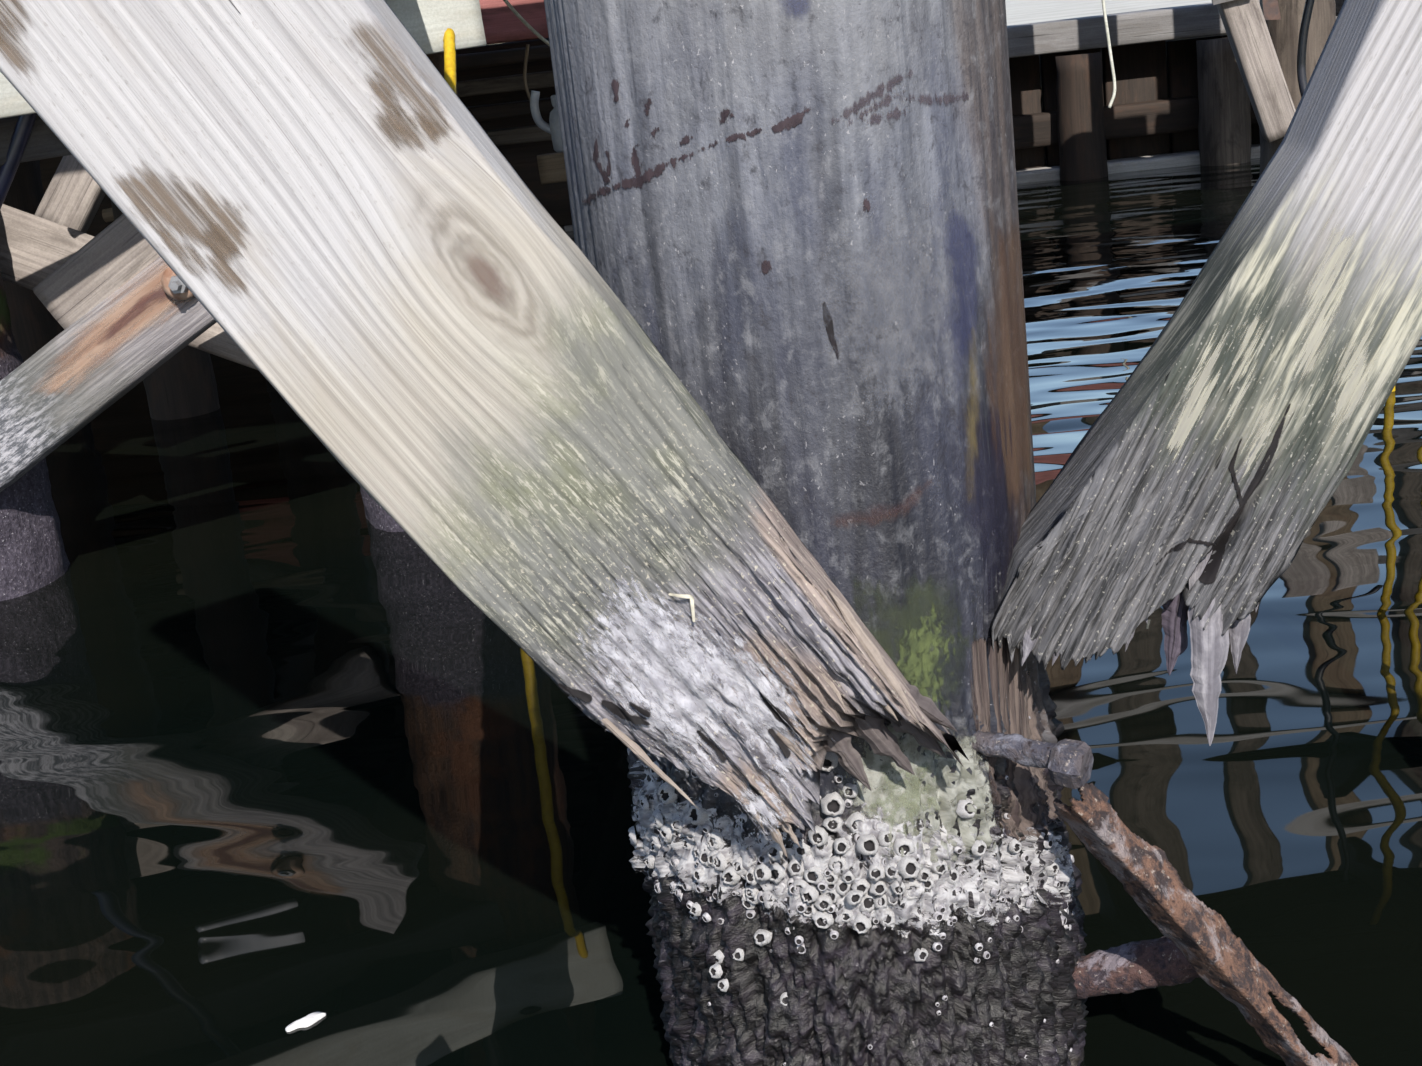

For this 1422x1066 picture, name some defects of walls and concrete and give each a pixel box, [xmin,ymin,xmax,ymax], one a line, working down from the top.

damp [353,26,450,147]
damp [119,169,245,291]
crack [1156,404,1291,584]